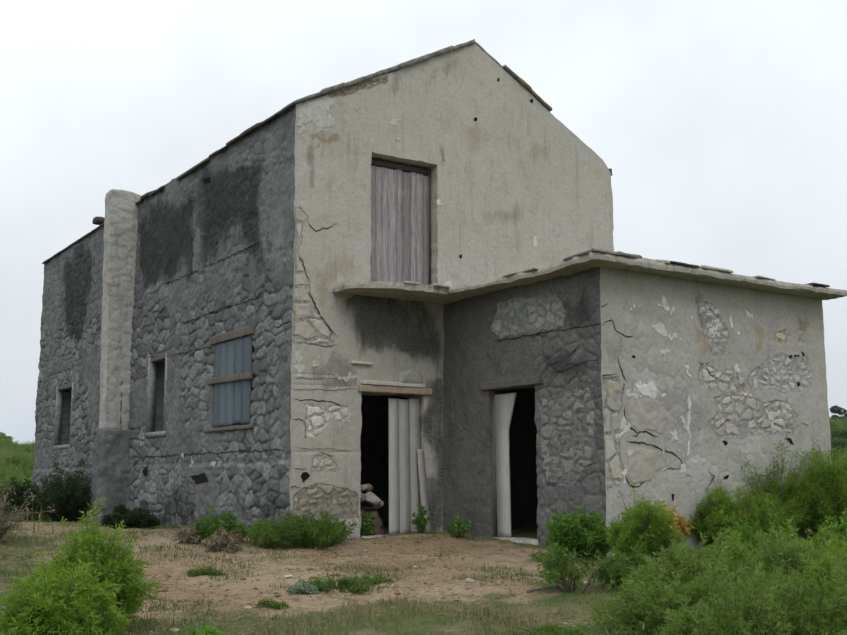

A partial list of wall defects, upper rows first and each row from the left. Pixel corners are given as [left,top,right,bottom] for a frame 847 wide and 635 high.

flaking render [296,75,388,138]
damp [140,165,262,287]
crack [272,206,338,347]
spalling [293,483,360,519]
spalling [304,403,351,439]
damp [347,295,440,363]
damp [421,380,445,531]
spalling [490,293,566,338]
crack [494,302,689,476]
spalling [539,376,666,491]
spalling [690,297,740,355]
spalling [675,328,812,439]